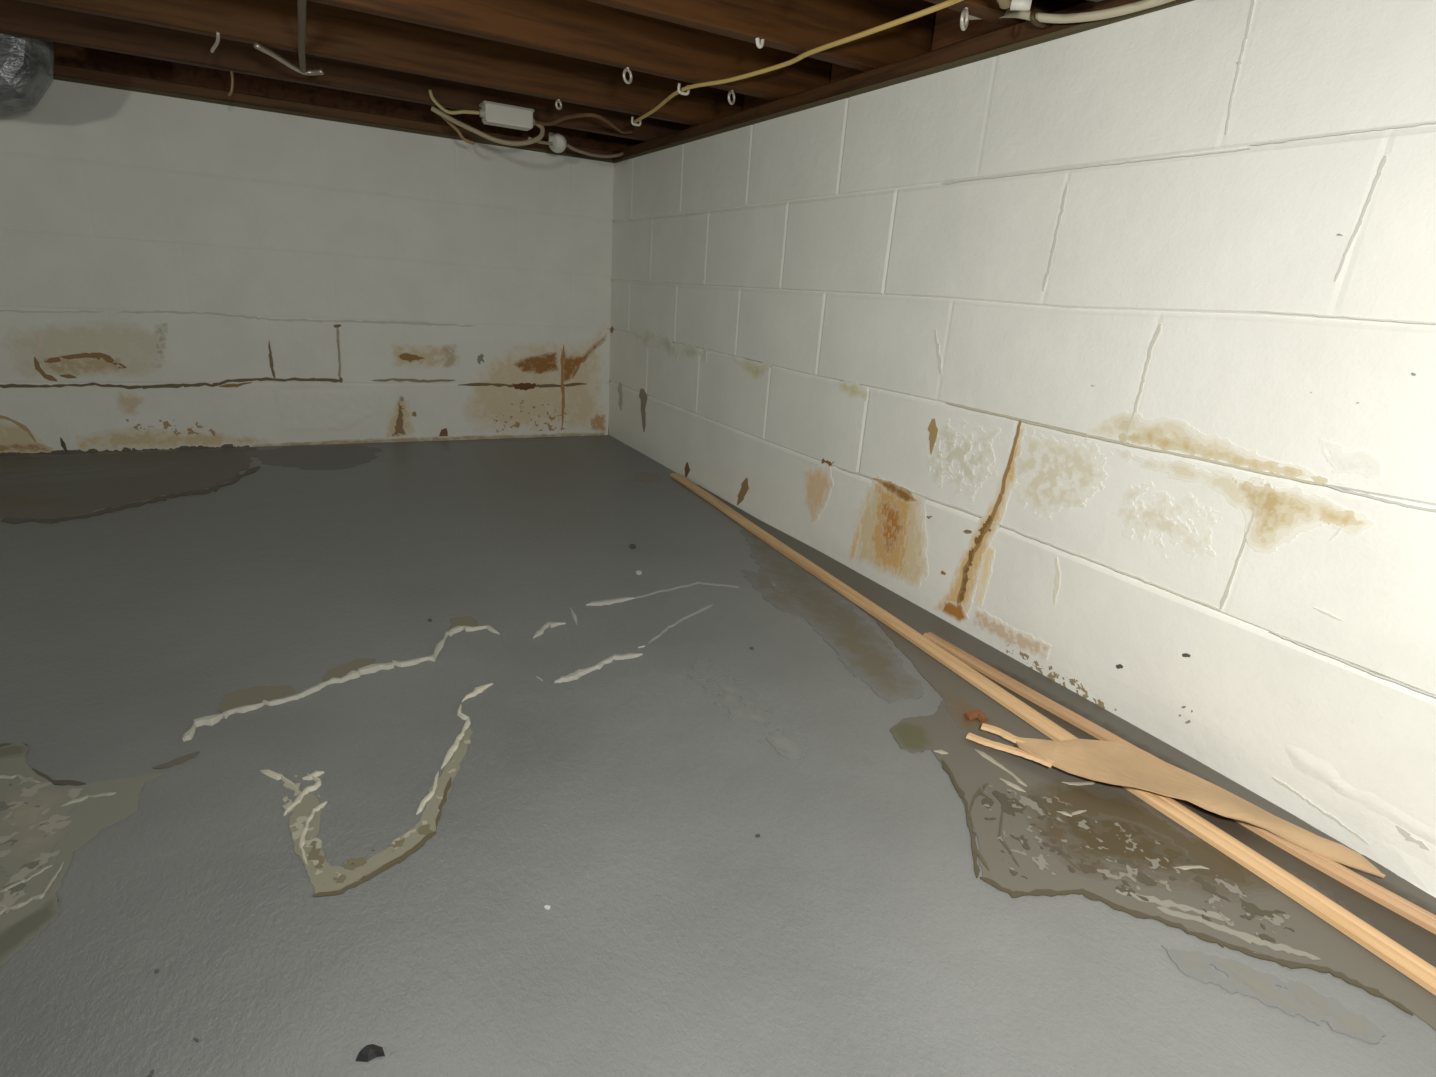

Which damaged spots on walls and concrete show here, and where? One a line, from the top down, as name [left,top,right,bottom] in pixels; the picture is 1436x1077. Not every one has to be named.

crack [941,0,1436,324]
crack [0,310,585,389]
damp [0,318,605,524]
rust [390,320,614,435]
crack [836,466,875,480]
rust [849,420,1026,622]
damp [925,411,1382,558]
crack [908,324,1436,611]
peeling [0,743,166,967]
peeling [260,683,493,897]
damp [702,487,1436,1044]